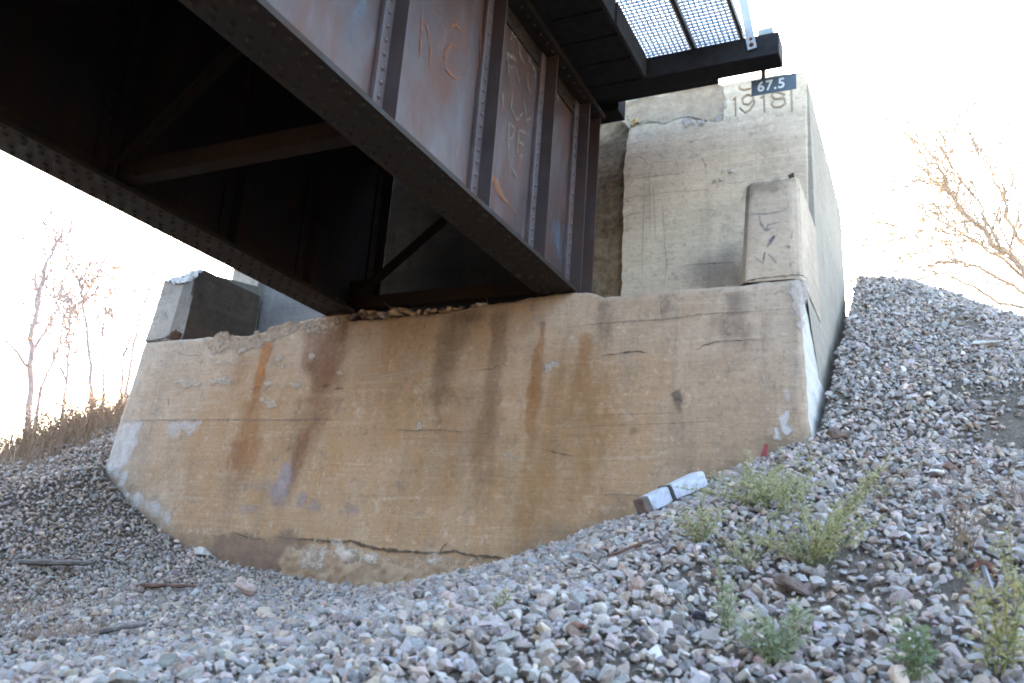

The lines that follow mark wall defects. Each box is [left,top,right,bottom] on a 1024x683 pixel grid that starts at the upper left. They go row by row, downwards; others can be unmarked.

spalling [208,315,343,355]
rust [254,340,273,395]
crack [217,533,504,559]